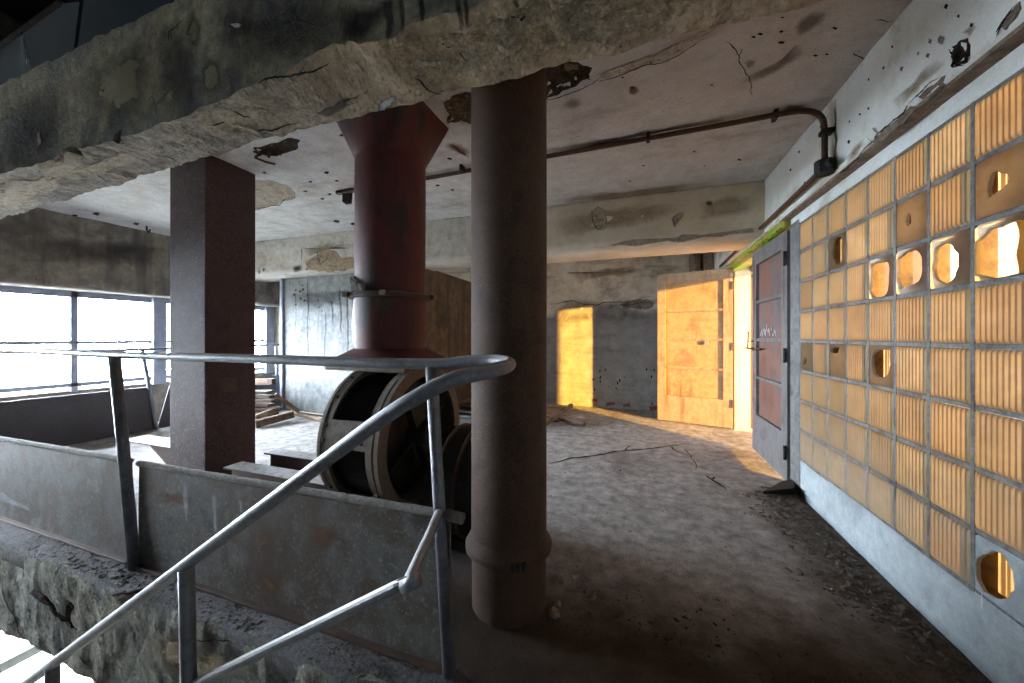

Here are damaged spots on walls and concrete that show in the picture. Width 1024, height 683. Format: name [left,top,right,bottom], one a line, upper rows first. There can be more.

spalling [996,1,1022,32]
crack [259,57,334,84]
spalling [547,26,716,100]
crack [728,42,752,94]
spalling [867,4,973,144]
spalling [444,92,471,125]
spalling [193,104,333,210]
spalling [305,249,355,273]
water stain [295,283,349,356]
crack [550,442,727,490]